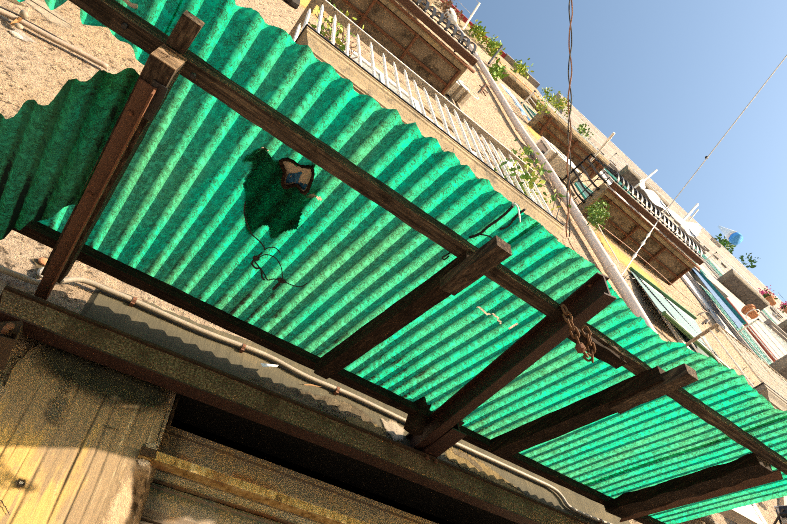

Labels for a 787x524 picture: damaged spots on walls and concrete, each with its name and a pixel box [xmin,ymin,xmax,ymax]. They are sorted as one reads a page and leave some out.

damp [38,345,169,408]
flaking render [249,378,405,441]
flaking render [445,447,528,496]